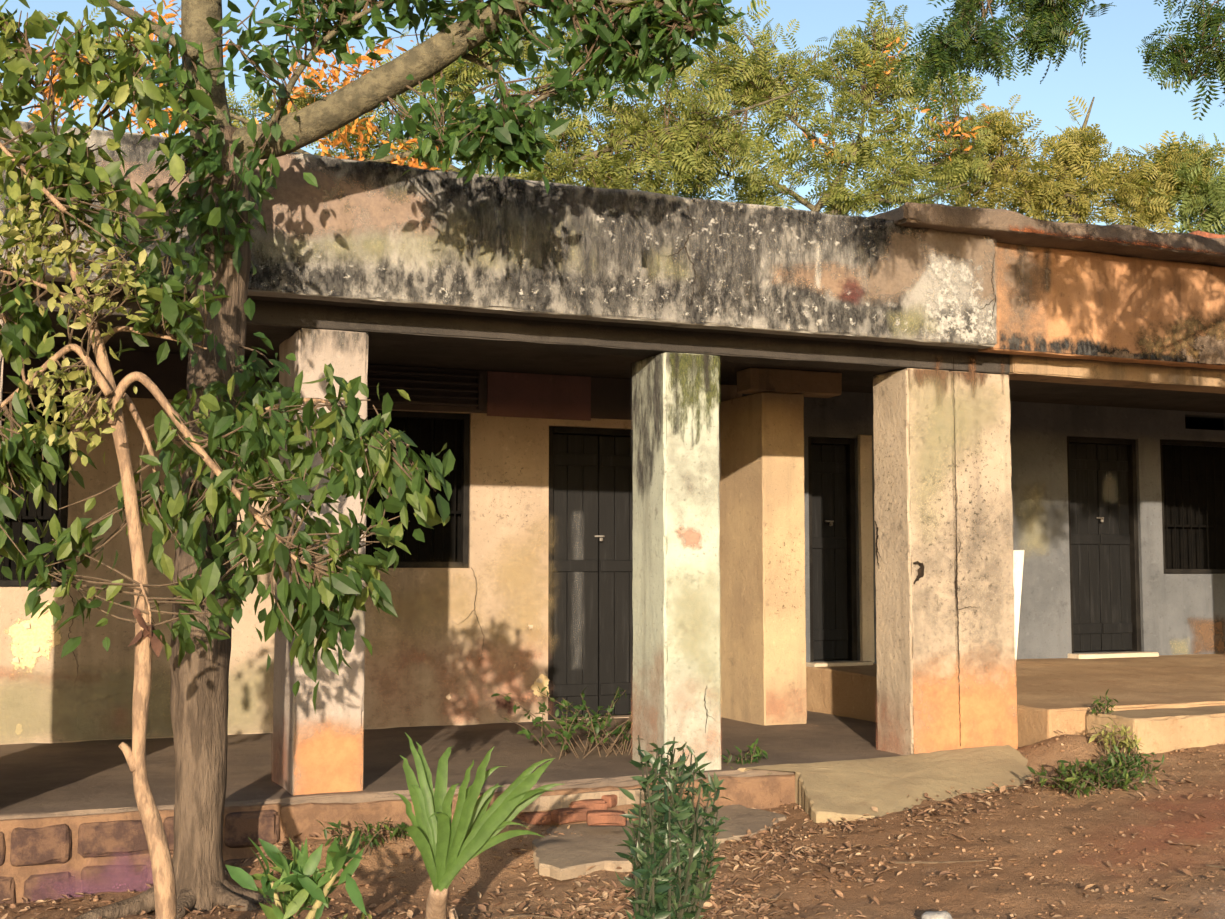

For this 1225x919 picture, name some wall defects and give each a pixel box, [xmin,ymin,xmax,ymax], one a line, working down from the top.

damp [41,248,142,280]
damp [248,159,1221,406]
flaking render [5,602,63,677]